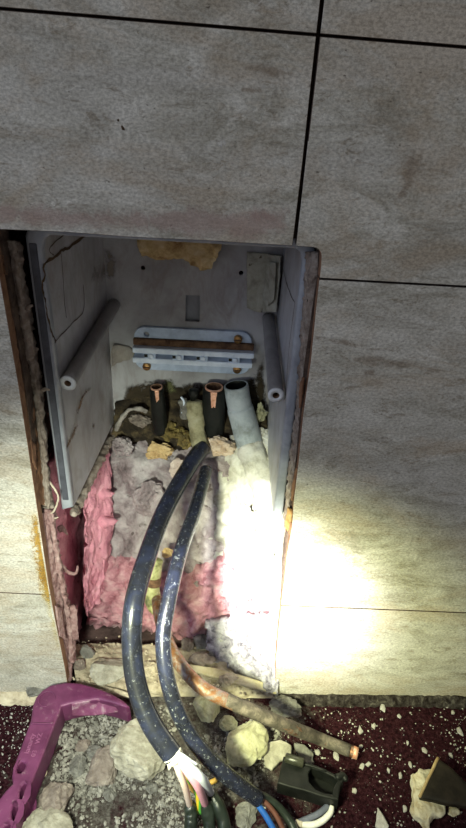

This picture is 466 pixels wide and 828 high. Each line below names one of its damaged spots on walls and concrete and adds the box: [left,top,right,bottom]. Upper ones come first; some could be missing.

crack [42,235,84,343]
corrosion [30,516,50,602]